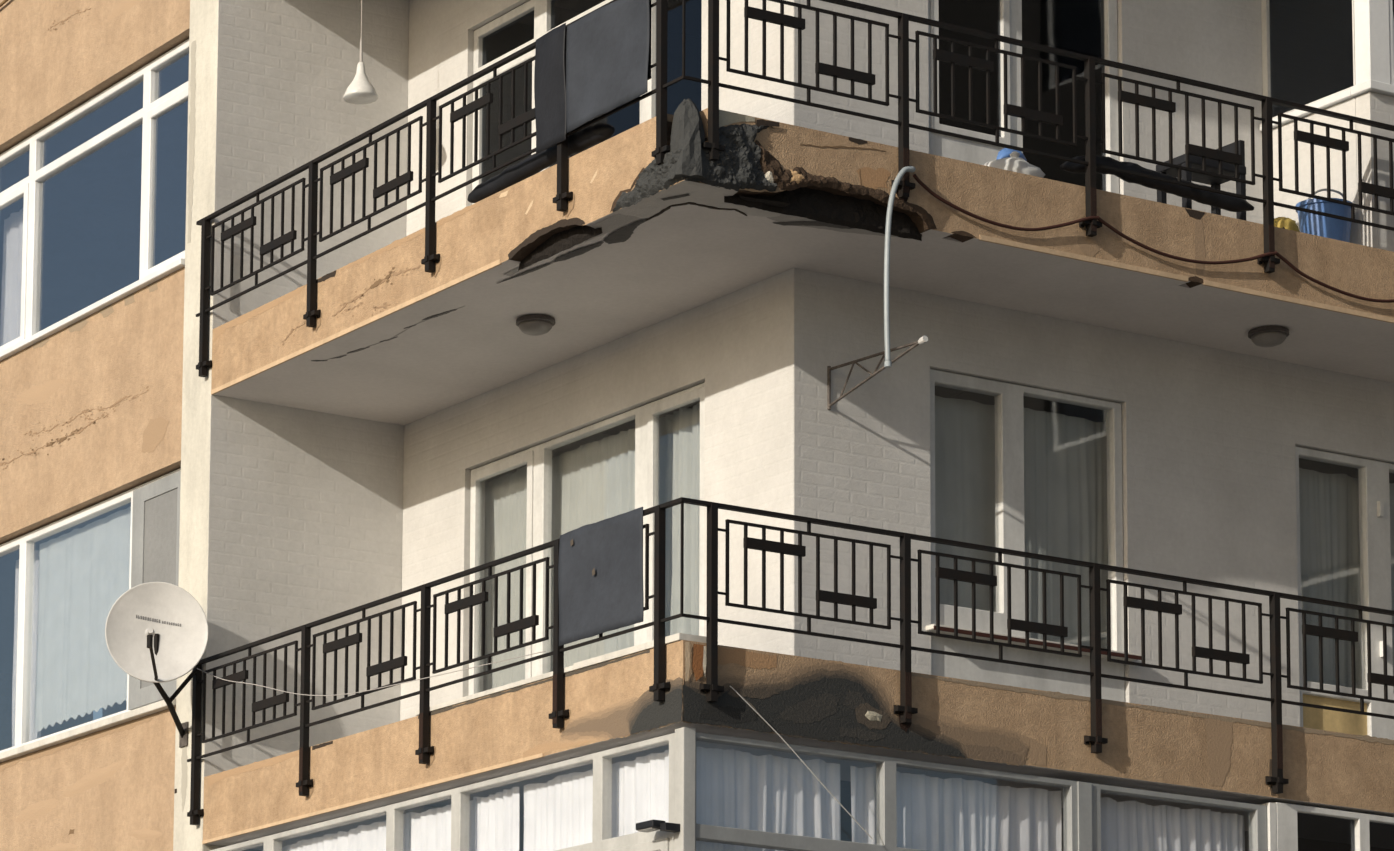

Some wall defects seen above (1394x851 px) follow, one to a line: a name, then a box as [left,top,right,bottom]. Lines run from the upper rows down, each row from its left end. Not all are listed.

flaking render [610,168,645,212]
spalling [719,110,976,241]
spalling [508,217,603,271]
crack [282,265,421,345]
crack [0,386,149,470]
water stain [523,659,1047,766]